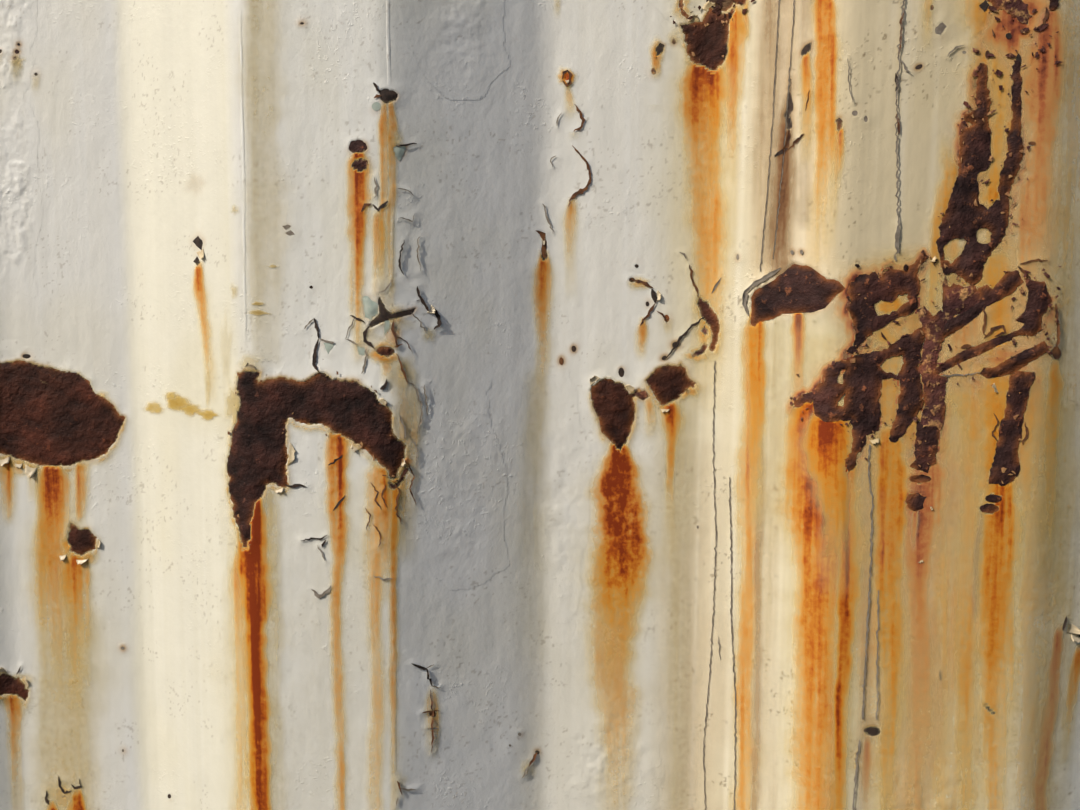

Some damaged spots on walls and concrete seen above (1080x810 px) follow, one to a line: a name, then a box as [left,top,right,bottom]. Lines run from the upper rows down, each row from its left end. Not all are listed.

rust [0,666,29,771]
rust [0,354,125,682]
rust [227,363,407,810]
rust [347,82,417,332]
rust [534,204,553,341]
rust [590,0,773,750]
rust [742,0,1064,810]
rust [1033,617,1080,810]